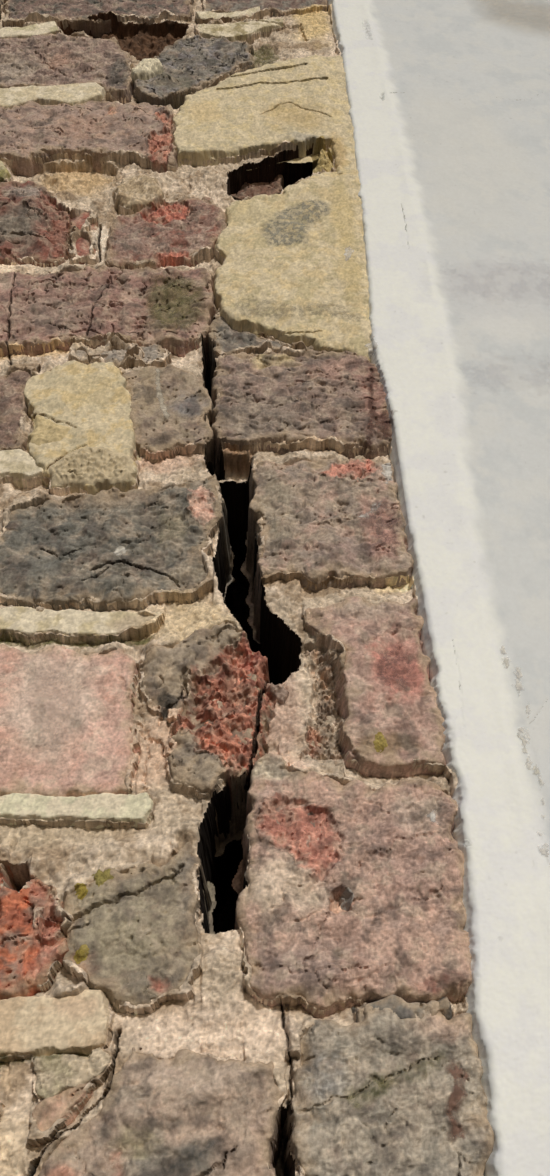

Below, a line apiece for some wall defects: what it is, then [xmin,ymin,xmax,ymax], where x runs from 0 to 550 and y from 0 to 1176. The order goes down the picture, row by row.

crack [197,317,302,934]
crack [268,1005,295,1176]